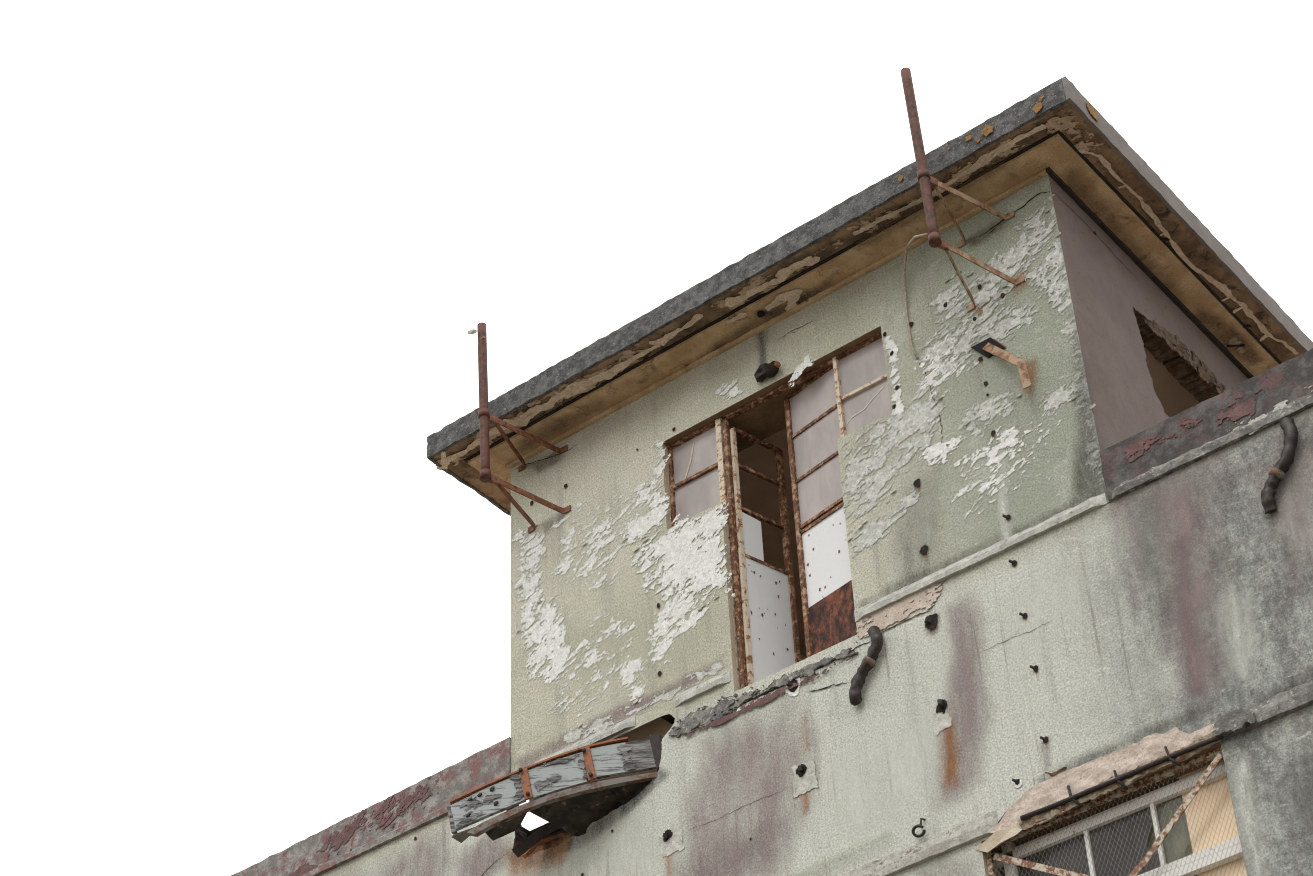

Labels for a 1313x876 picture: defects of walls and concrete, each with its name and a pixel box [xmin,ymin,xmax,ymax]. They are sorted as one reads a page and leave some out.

peeling [715,379,743,400]
peeling [788,353,813,387]
peeling [838,193,1104,560]
spalling [1123,312,1294,462]
peeling [511,427,735,743]
spalling [668,583,943,738]
corrosion [946,726,956,782]
spalling [975,707,1257,853]